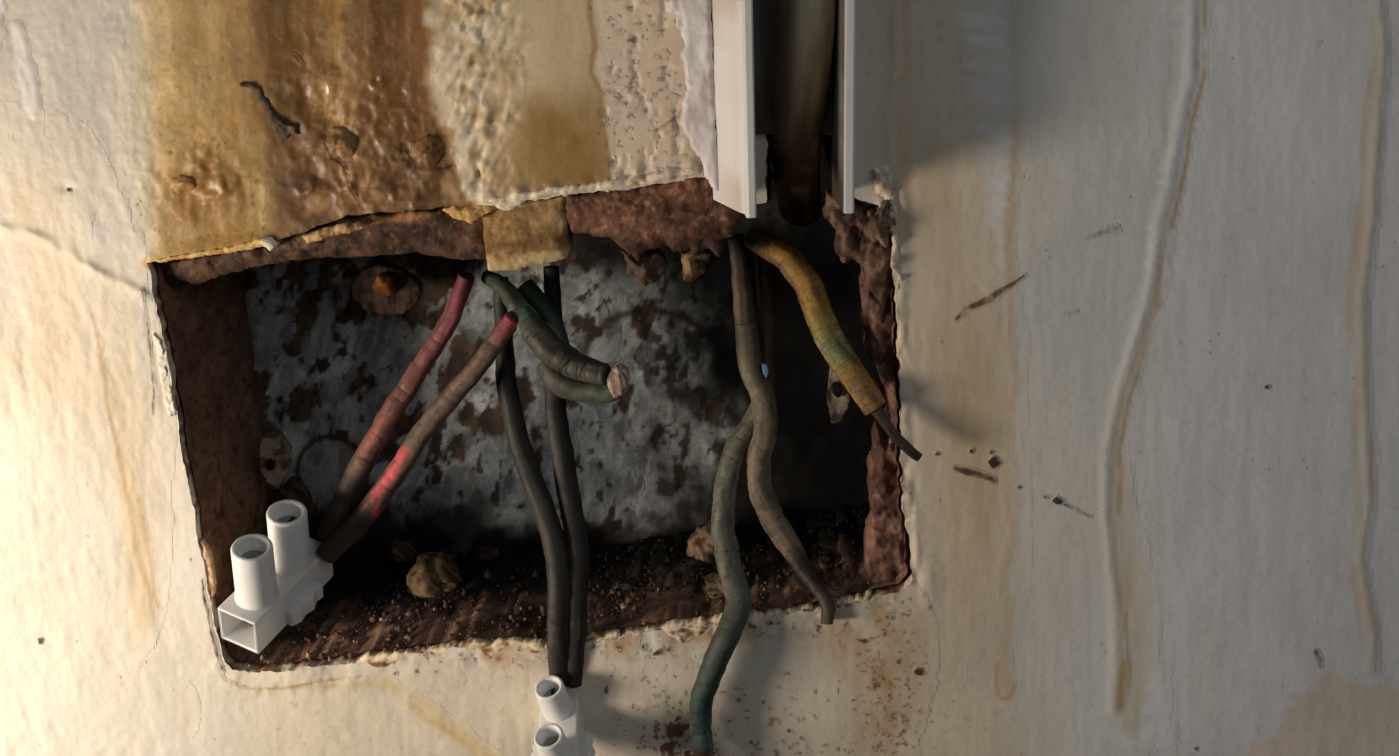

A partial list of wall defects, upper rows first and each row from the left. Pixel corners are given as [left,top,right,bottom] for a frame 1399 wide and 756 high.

corrosion [99,0,479,261]
damp [1102,0,1210,730]
damp [1340,0,1391,679]
corrosion [456,646,549,689]
corrosion [565,625,718,687]
corrosion [735,581,939,756]